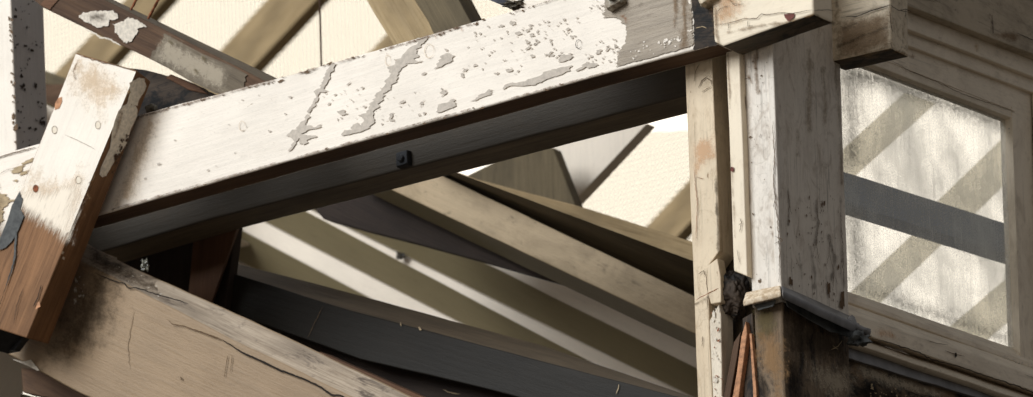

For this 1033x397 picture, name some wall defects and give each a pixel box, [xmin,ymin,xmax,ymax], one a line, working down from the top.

peeling [79,10,146,46]
peeling [286,0,694,157]
crack [96,273,344,397]
leakage [859,367,938,396]